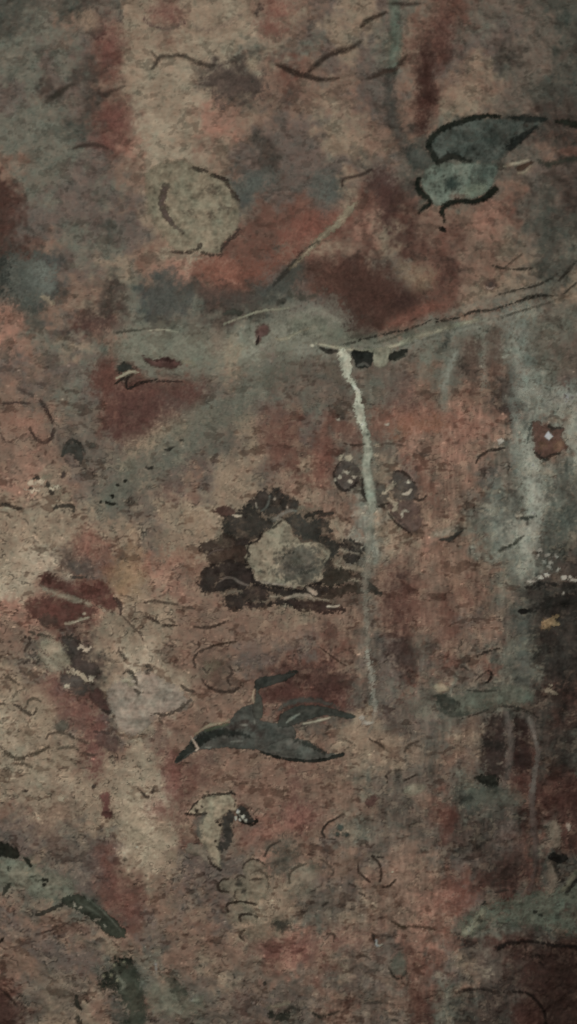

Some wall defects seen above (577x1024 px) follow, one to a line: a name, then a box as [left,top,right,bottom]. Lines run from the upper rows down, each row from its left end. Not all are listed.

spalling [351,350,373,368]
spalling [388,349,407,361]
water stain [337,348,378,733]